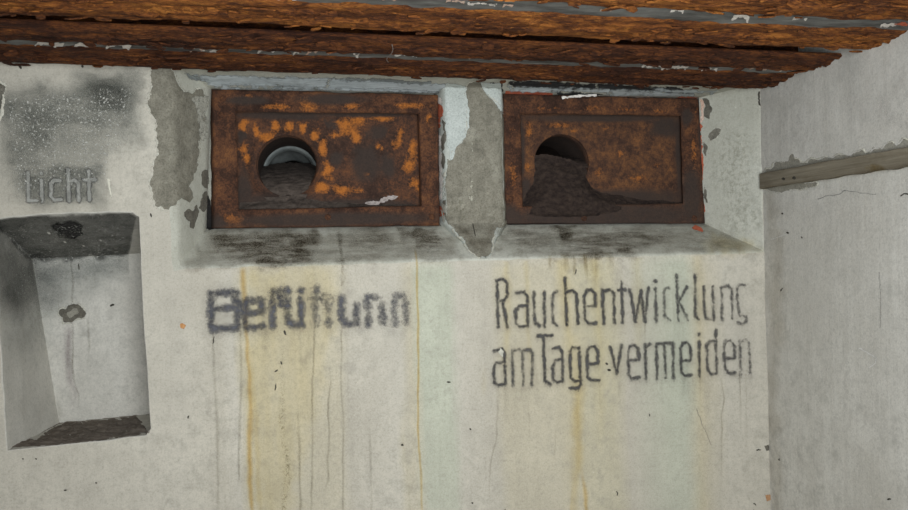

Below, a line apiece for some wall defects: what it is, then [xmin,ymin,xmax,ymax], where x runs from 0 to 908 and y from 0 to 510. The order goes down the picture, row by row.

spalling [146,67,209,229]
spalling [438,80,597,259]